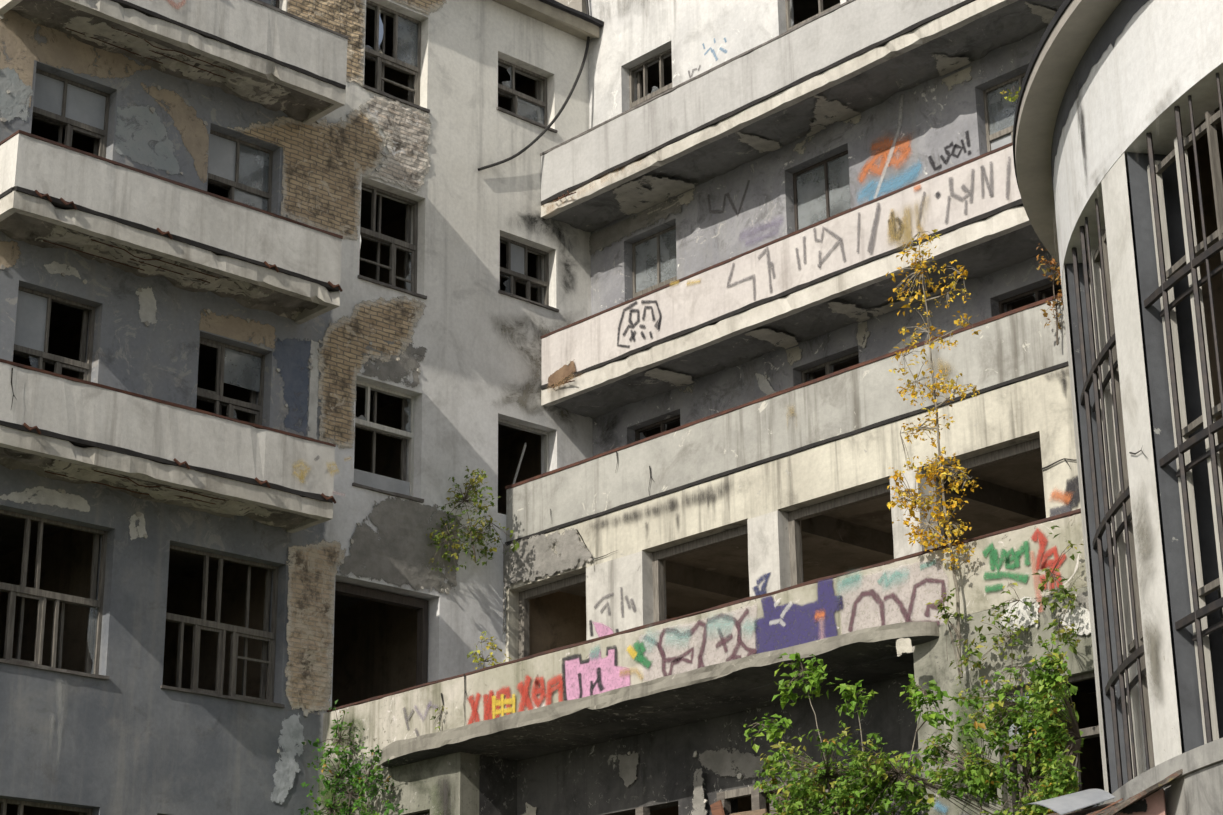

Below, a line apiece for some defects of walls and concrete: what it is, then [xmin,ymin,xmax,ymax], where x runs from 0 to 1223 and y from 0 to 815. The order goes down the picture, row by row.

flaking render [394,0,446,15]
flaking render [0,0,431,241]
peeling [736,95,861,154]
flaking render [0,241,21,270]
spalling [35,222,269,326]
flaking render [199,296,427,448]
spalling [0,460,280,518]
peeling [128,512,148,540]
flaking render [1000,596,1039,634]
flaking render [1056,590,1091,635]
flaking render [270,496,462,804]
peeling [692,747,764,815]